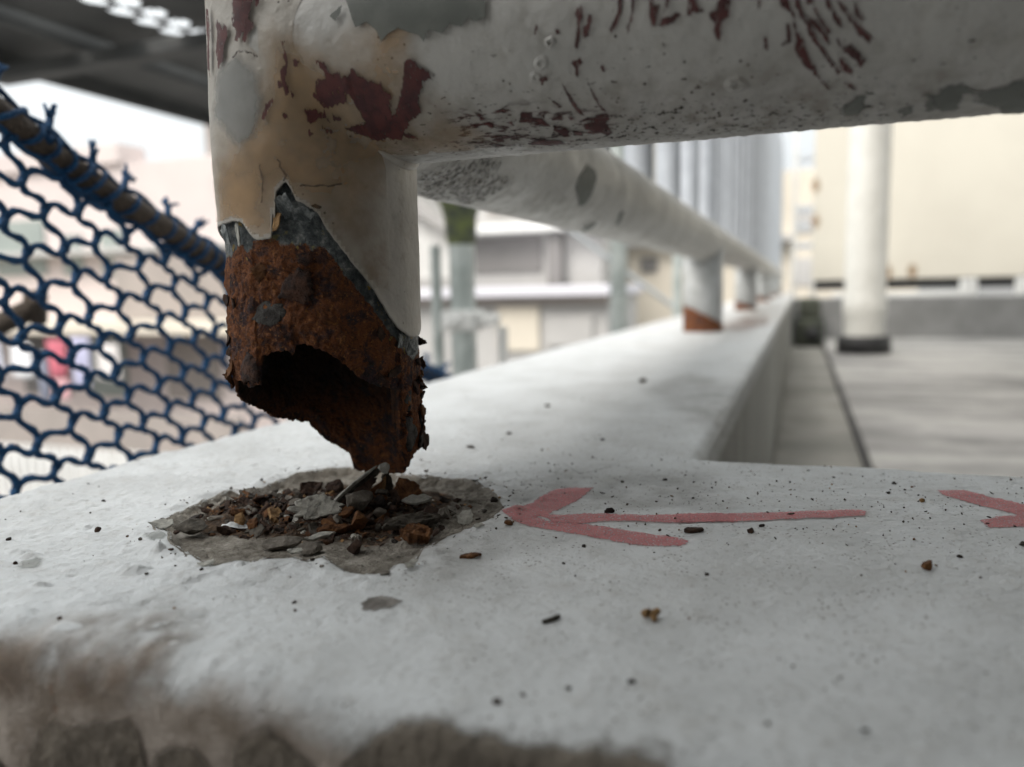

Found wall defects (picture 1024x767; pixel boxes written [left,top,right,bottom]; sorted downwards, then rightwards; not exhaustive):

peeling [330,0,485,42]
peeling [216,58,257,143]
peeling [841,96,865,115]
peeling [926,80,1024,115]
peeling [272,192,293,232]
peeling [220,223,241,247]
spalling [148,467,513,575]